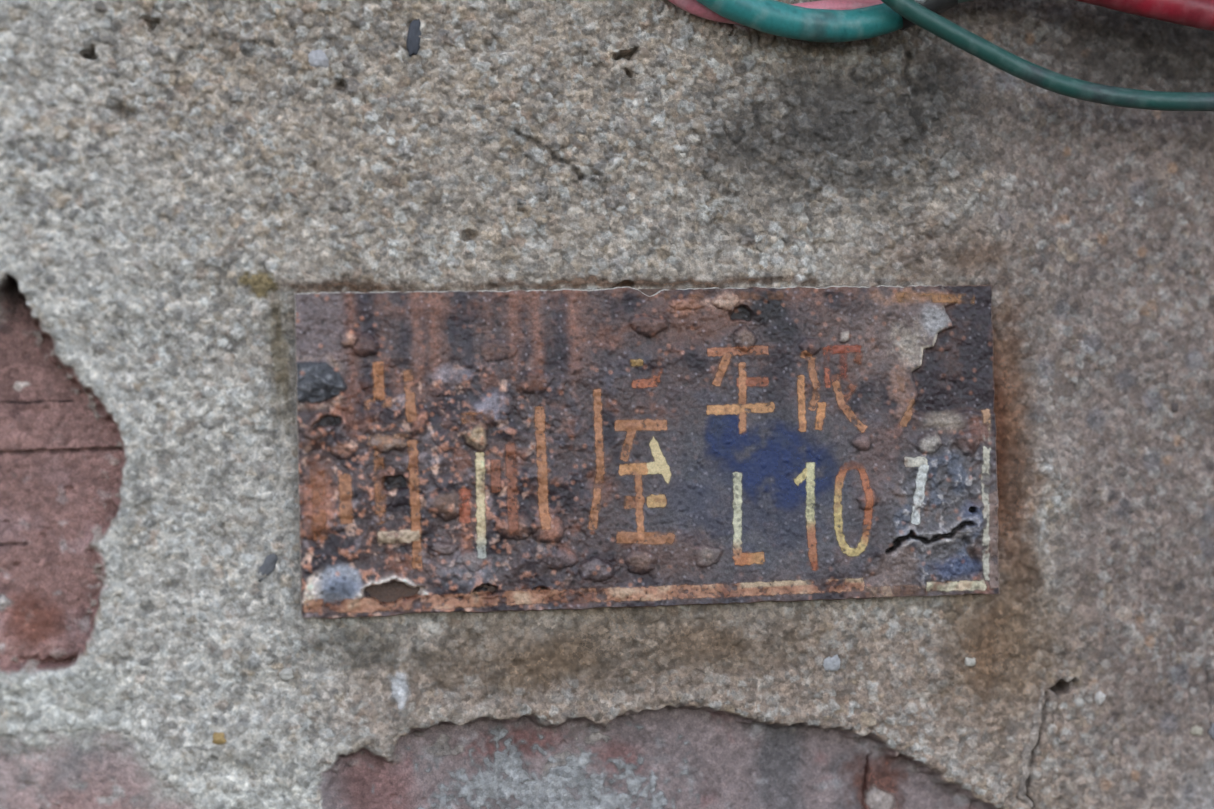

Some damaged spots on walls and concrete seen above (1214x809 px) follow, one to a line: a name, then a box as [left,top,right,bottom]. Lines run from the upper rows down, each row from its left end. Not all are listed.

rust [289,278,413,293]
rust [465,275,813,290]
spalling [0,300,127,675]
rust [993,339,1027,567]
spalling [0,728,196,809]
spalling [317,702,998,809]
crack [1025,692,1047,801]